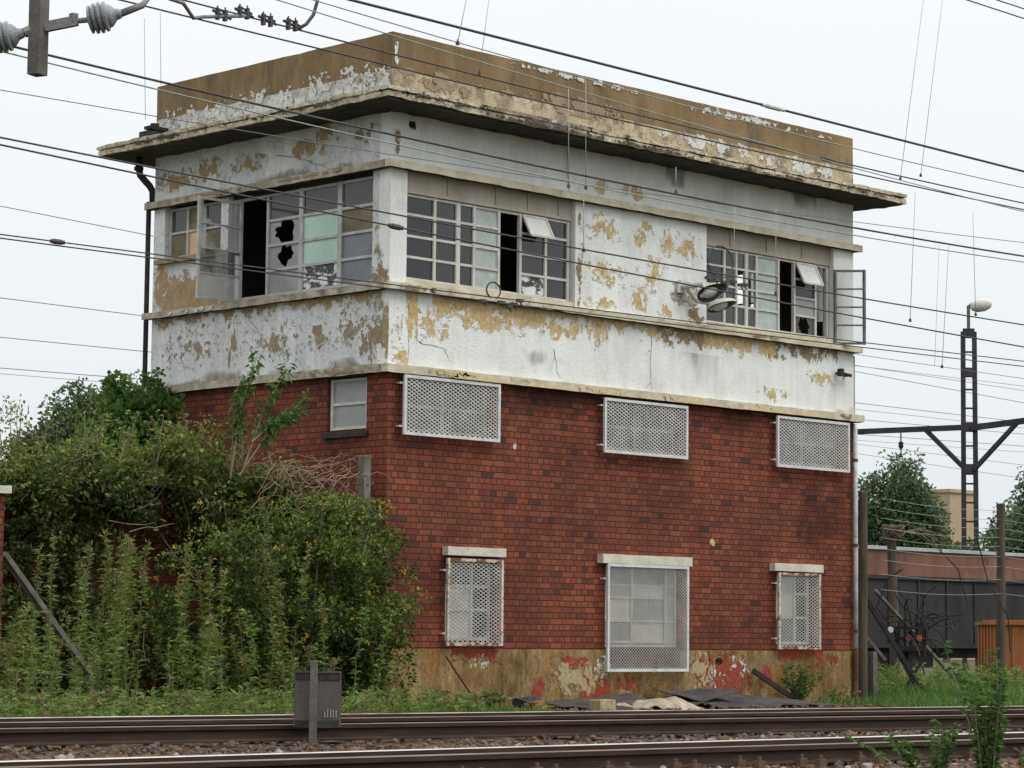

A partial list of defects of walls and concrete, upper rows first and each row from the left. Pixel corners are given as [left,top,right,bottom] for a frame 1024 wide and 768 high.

spalling [109,105,206,150]
flaking render [157,151,269,204]
flaking render [291,121,381,160]
peeling [240,62,642,140]
peeling [690,107,739,121]
spalling [711,138,806,182]
peeling [152,211,838,387]
peeling [419,369,819,417]
peeling [451,649,499,668]
flaking render [529,654,641,698]
peeling [690,651,838,695]